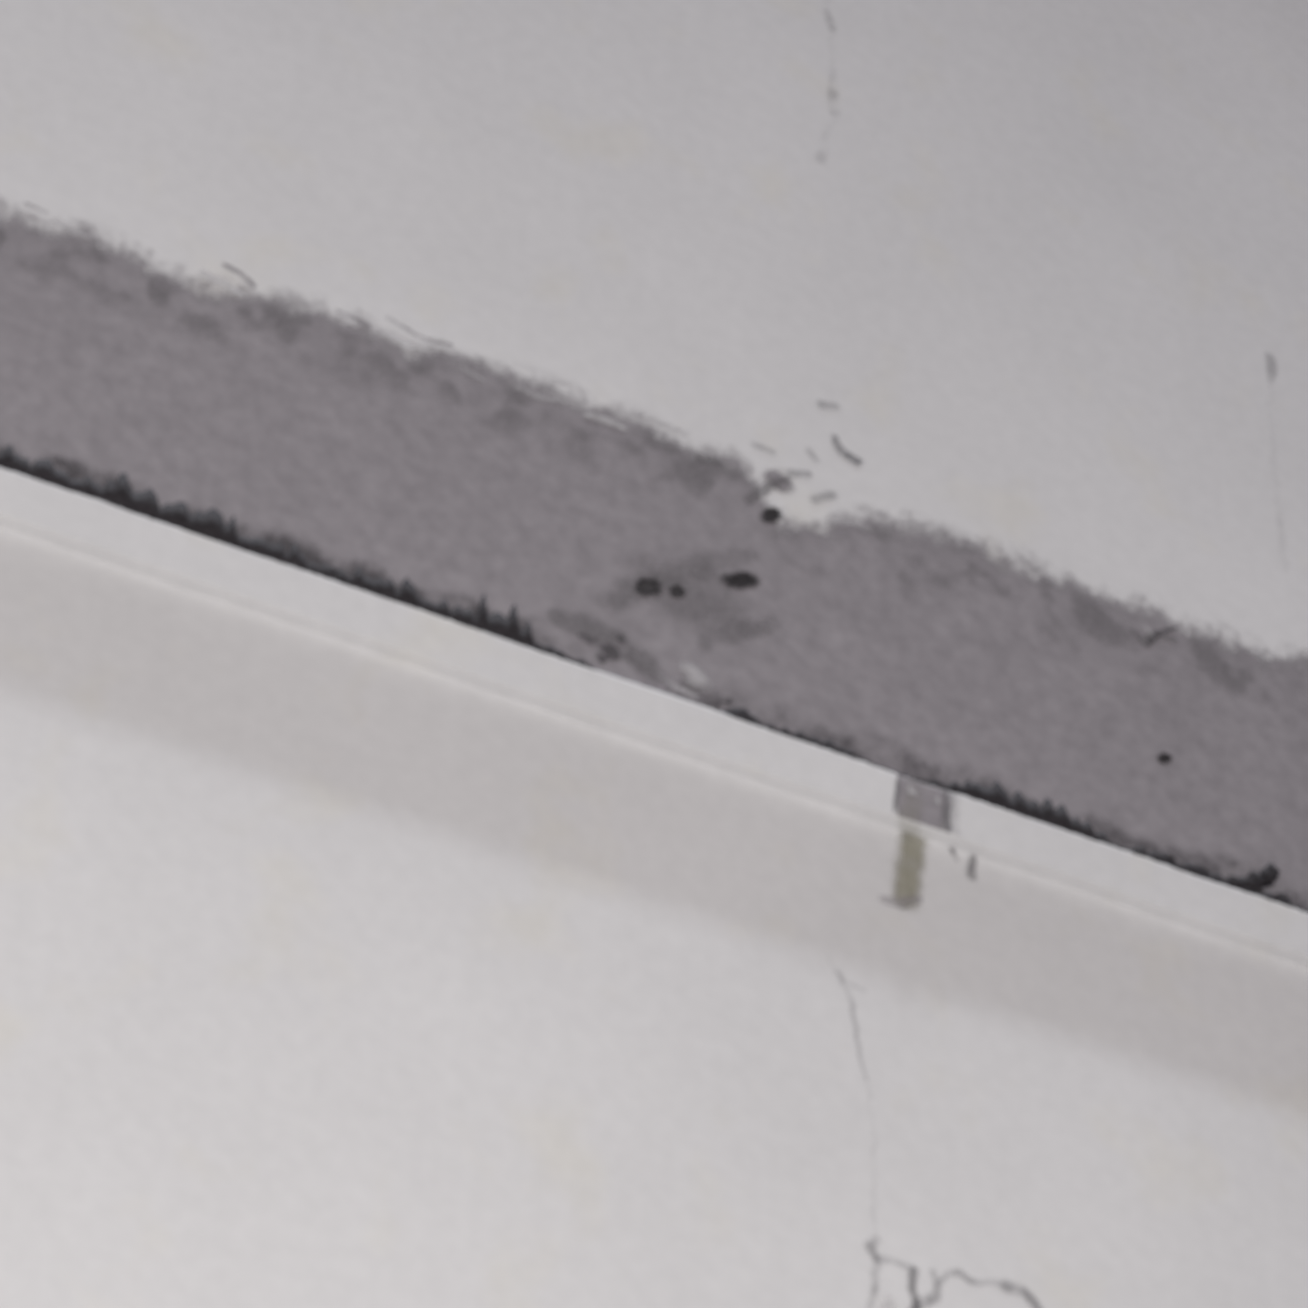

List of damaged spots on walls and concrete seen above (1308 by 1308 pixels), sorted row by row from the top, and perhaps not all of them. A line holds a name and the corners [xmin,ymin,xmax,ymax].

peeling [0,203,1308,910]